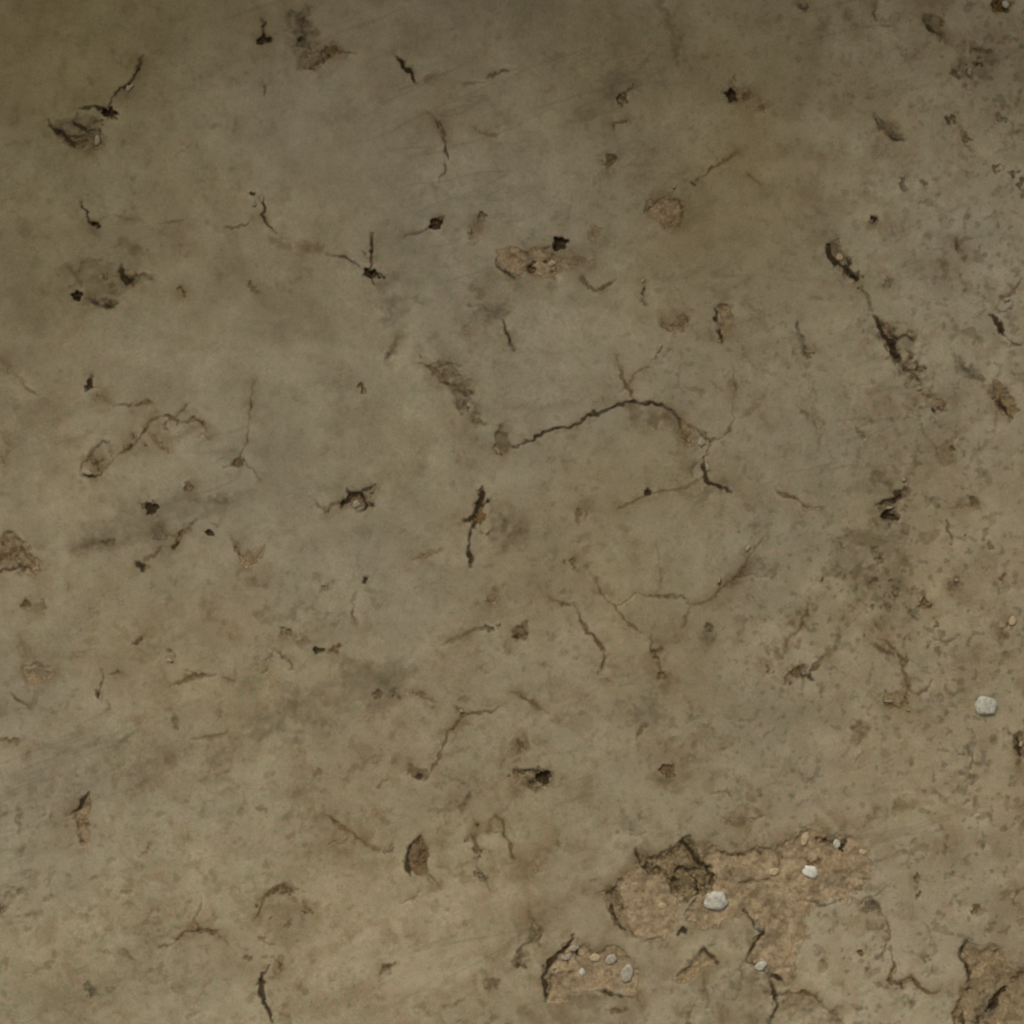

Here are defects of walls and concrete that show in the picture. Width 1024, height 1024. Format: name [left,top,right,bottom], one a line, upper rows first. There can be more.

crack [340,237,385,279]
spalling [496,237,612,291]
crack [82,399,204,478]
crack [524,373,730,492]
spalling [0,531,42,575]
crack [341,487,375,511]
crack [463,489,489,566]
spalling [404,836,438,885]
spalling [597,827,873,1019]
crack [258,955,283,1018]
spalling [541,938,640,1013]
peeling [953,943,1024,1024]